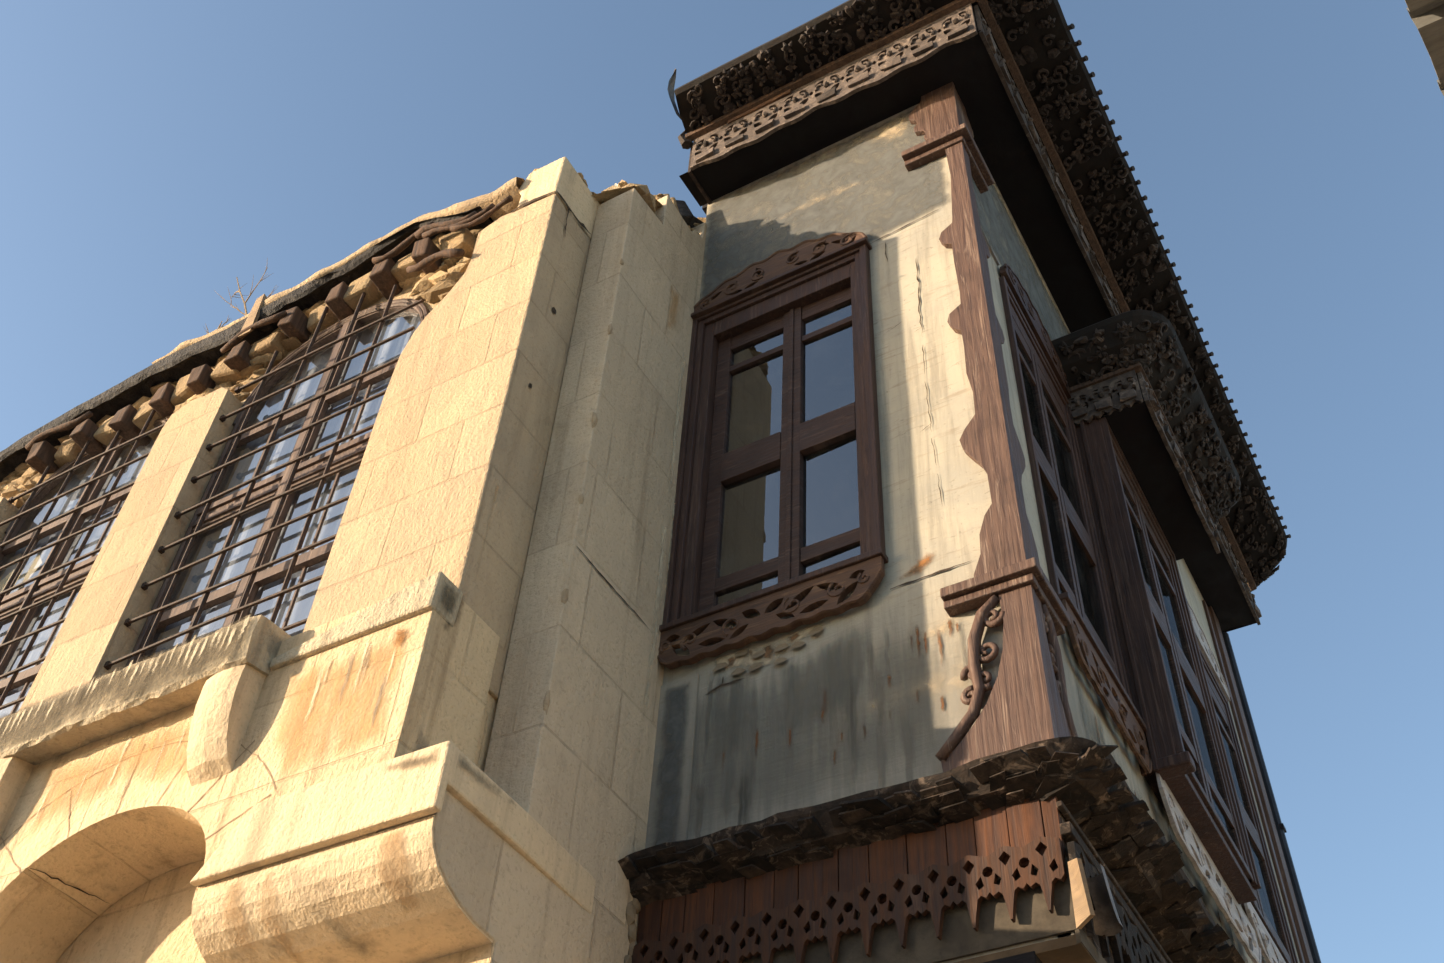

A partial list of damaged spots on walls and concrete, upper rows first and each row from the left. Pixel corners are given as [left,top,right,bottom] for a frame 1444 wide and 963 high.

crack [870,209,942,502]
peeling [713,626,823,676]
water stain [654,688,686,846]
crack [30,868,107,903]